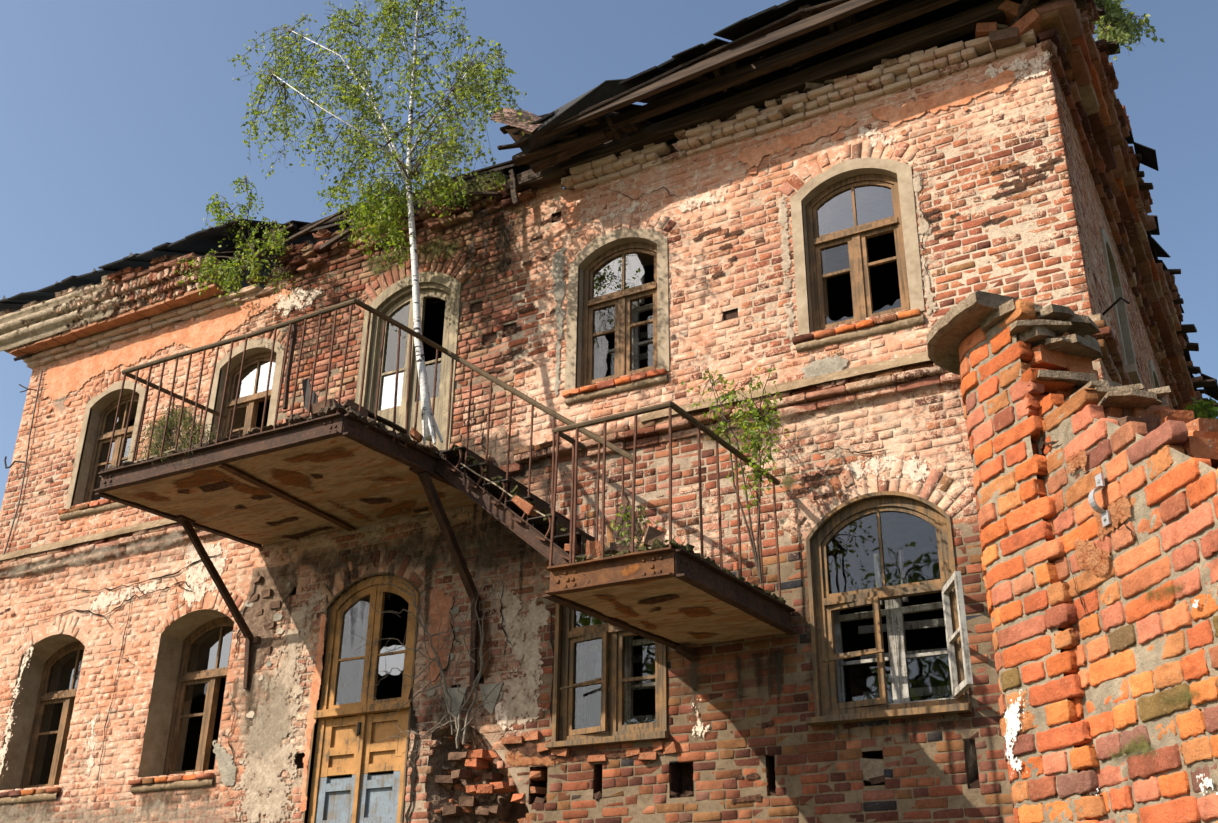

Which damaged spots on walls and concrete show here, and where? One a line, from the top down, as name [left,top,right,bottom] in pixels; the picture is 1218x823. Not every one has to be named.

peeling [735,113,857,174]
peeling [871,70,1016,135]
peeling [43,287,322,418]
corrosion [272,448,354,489]
water stain [298,503,539,641]
corrosion [622,564,639,576]
crack [40,553,226,803]
water stain [231,676,271,730]
spalling [421,577,694,823]
water stain [1003,689,1024,774]